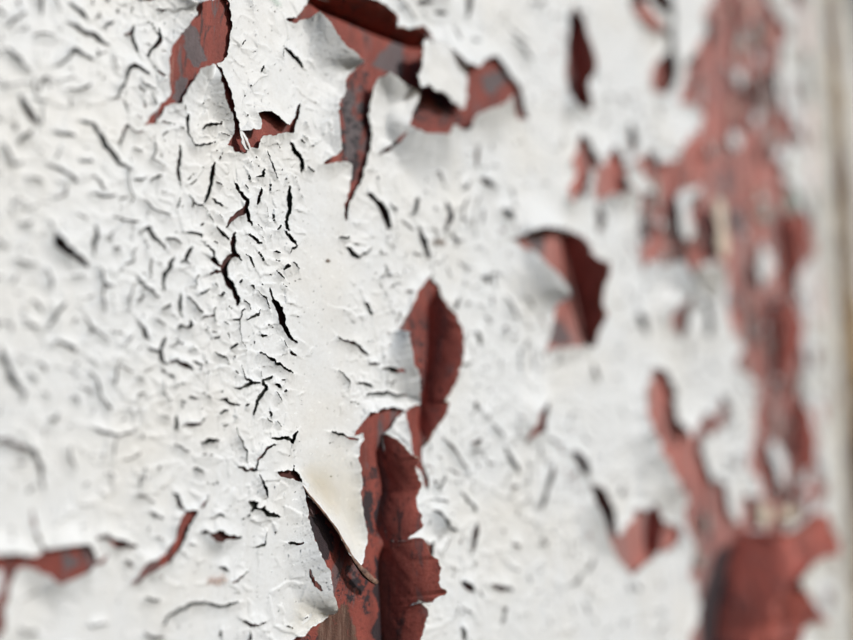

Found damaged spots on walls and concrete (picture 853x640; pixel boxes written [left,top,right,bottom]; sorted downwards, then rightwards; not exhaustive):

peeling [112,0,537,233]
crack [0,0,325,522]
crack [360,299,375,319]
crack [334,330,416,400]
crack [336,174,502,263]
crack [460,272,520,371]
peeling [483,0,840,640]
peeling [0,263,485,640]
crack [324,427,363,443]
crack [427,410,522,520]
crack [139,525,329,640]
crack [459,576,516,597]